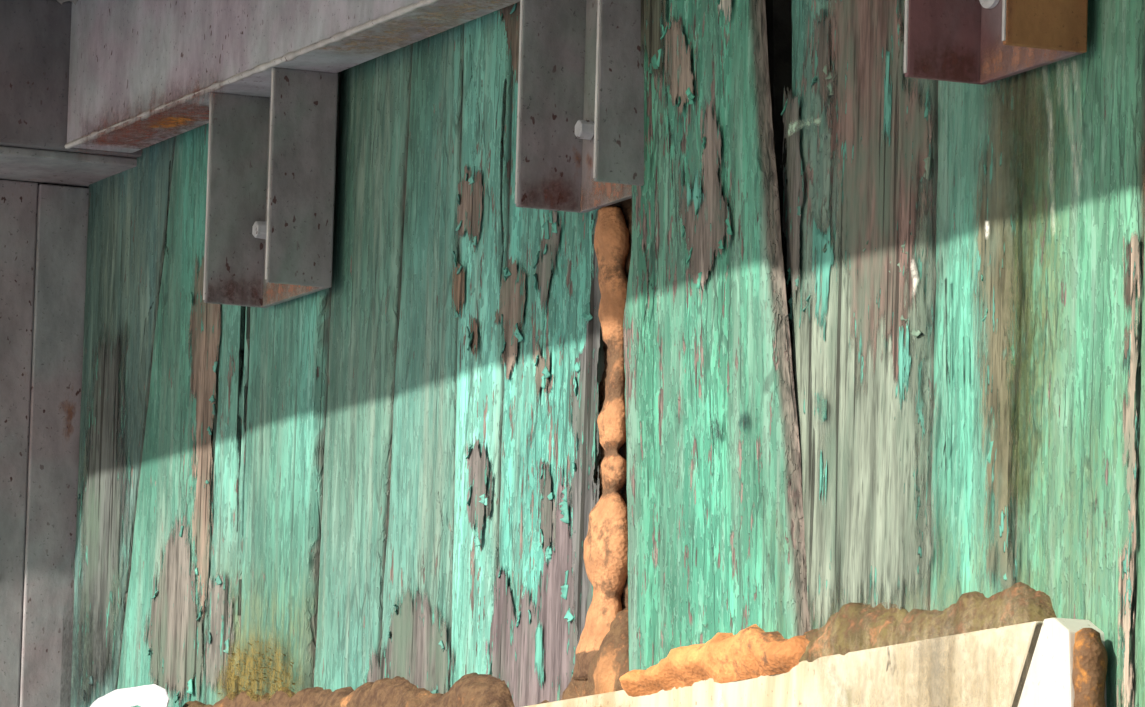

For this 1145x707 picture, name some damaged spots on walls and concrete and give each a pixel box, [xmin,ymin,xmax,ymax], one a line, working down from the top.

corrosion [87,87,209,147]
peeling [640,0,733,296]
corrosion [922,46,1056,81]
peeling [452,164,485,360]
peeling [466,438,493,547]
peeling [485,210,601,707]
peeling [364,577,455,694]